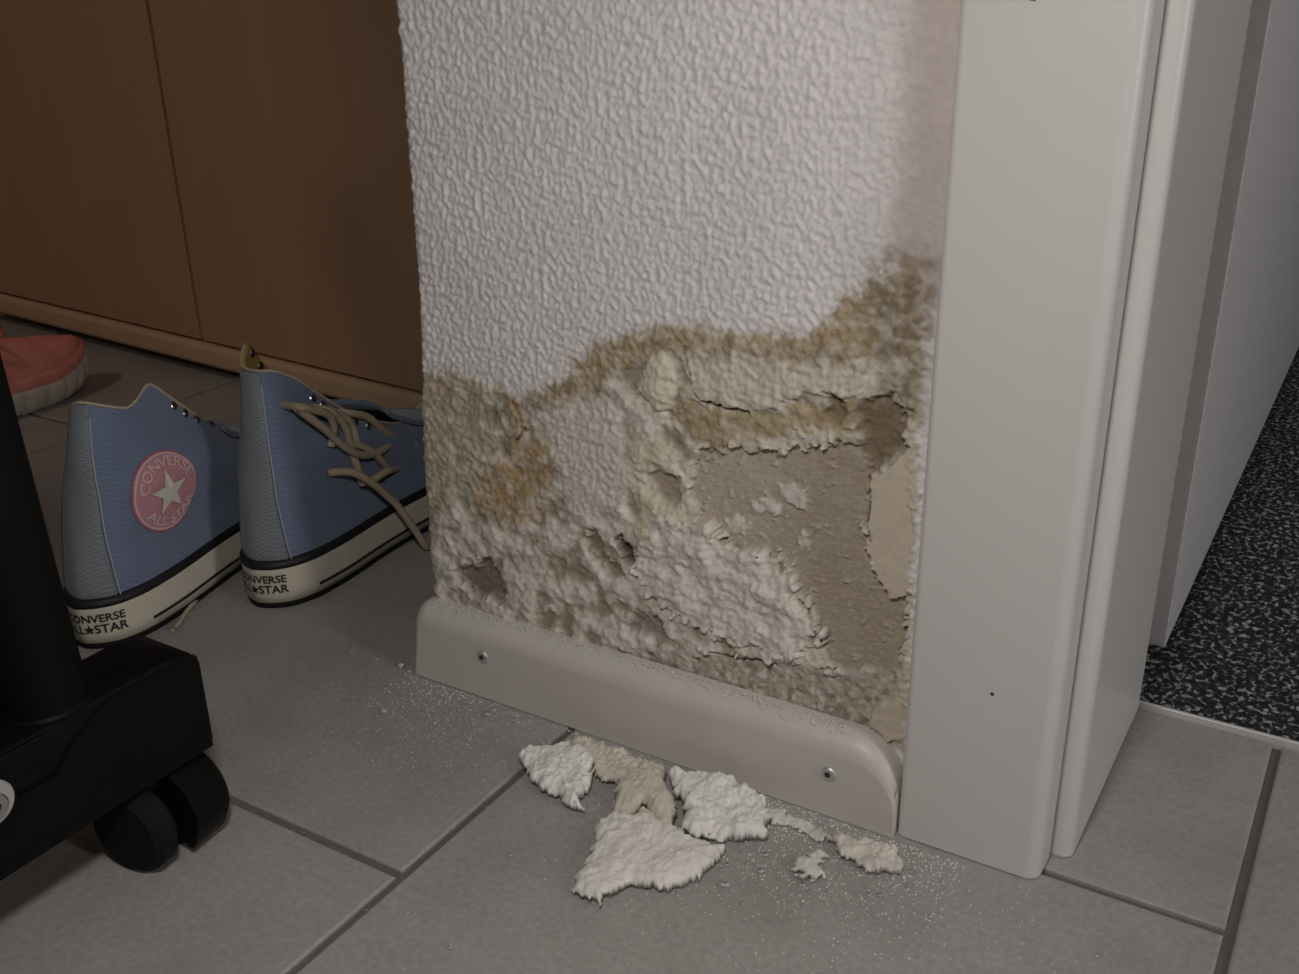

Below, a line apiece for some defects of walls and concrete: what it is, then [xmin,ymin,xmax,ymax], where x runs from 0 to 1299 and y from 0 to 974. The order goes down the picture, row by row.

flaking render [421,258,928,750]